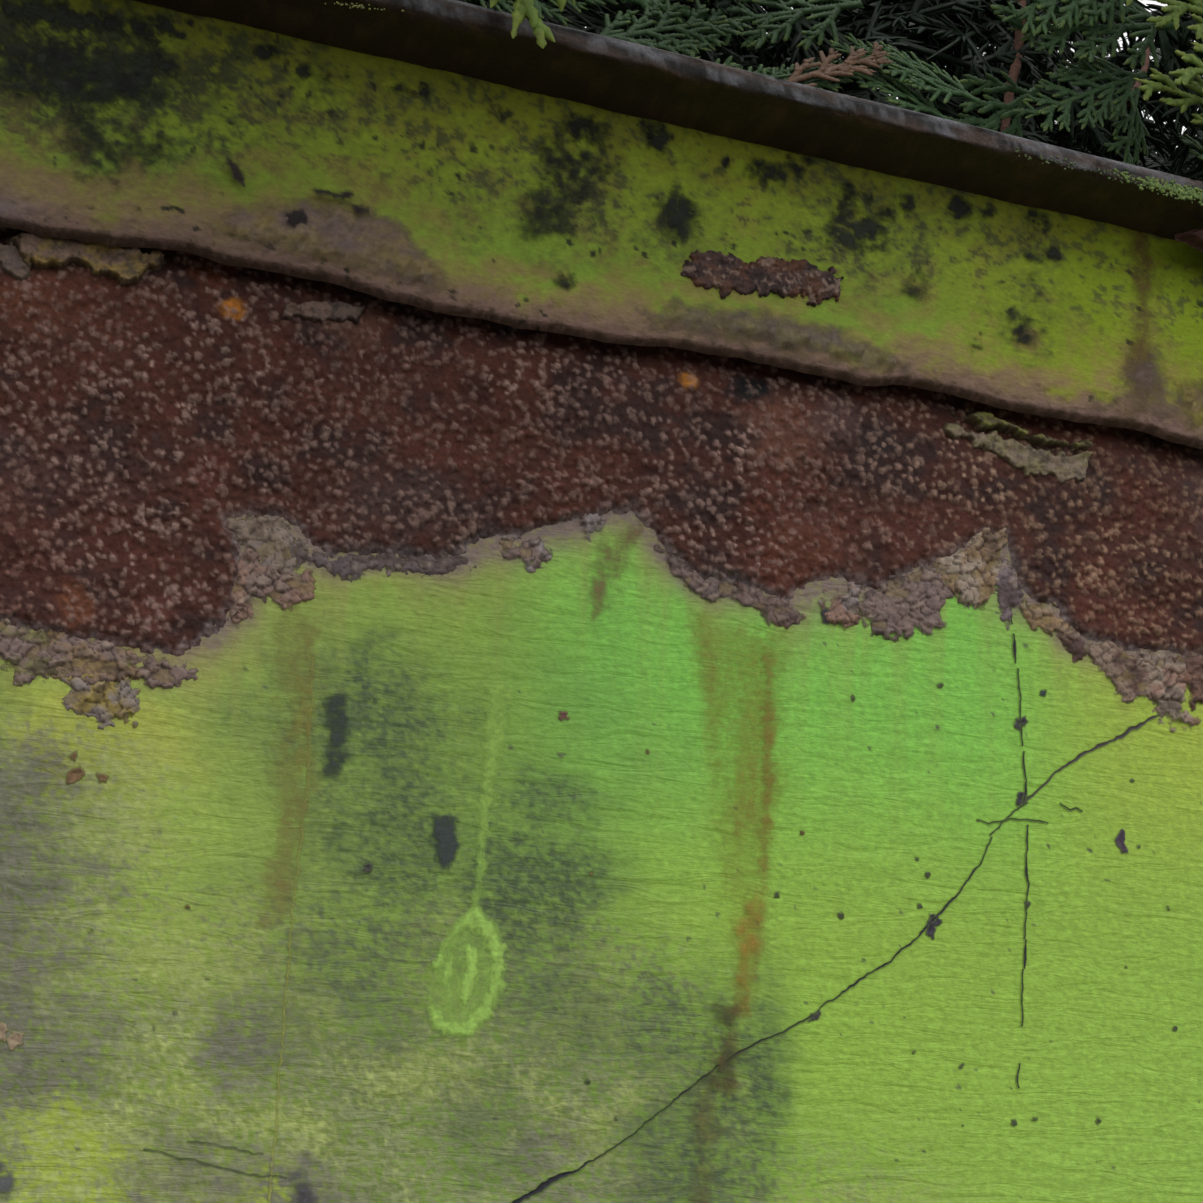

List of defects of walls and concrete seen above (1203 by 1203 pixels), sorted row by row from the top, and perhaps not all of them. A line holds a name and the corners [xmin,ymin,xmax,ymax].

mould [0,2,194,171]
mould [641,121,674,151]
mould [522,112,613,237]
mould [746,155,814,185]
mould [658,186,699,242]
mould [827,183,916,253]
mould [948,195,996,219]
mould [1025,246,1061,260]
mould [1010,309,1033,343]
crack [511,604,1159,1203]